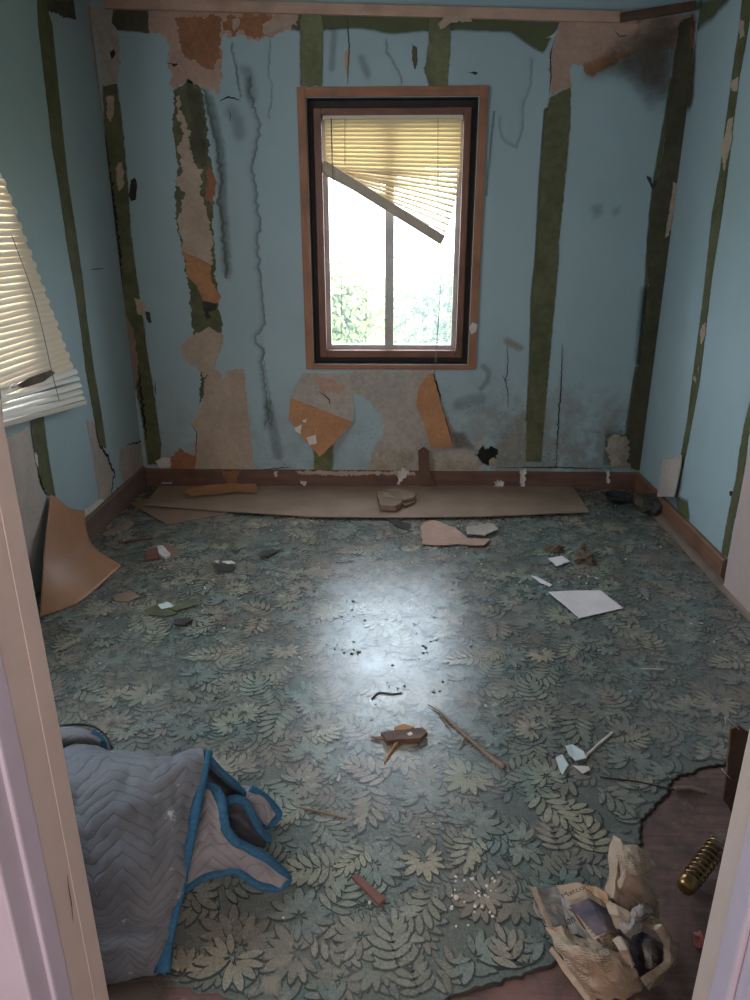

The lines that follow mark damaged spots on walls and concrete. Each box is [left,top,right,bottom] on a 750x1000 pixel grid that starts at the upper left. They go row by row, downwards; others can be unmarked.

peeling [547,13,696,98]
peeling [148,11,298,469]
peeling [84,420,114,516]
peeling [295,370,498,486]
crack [497,353,599,469]